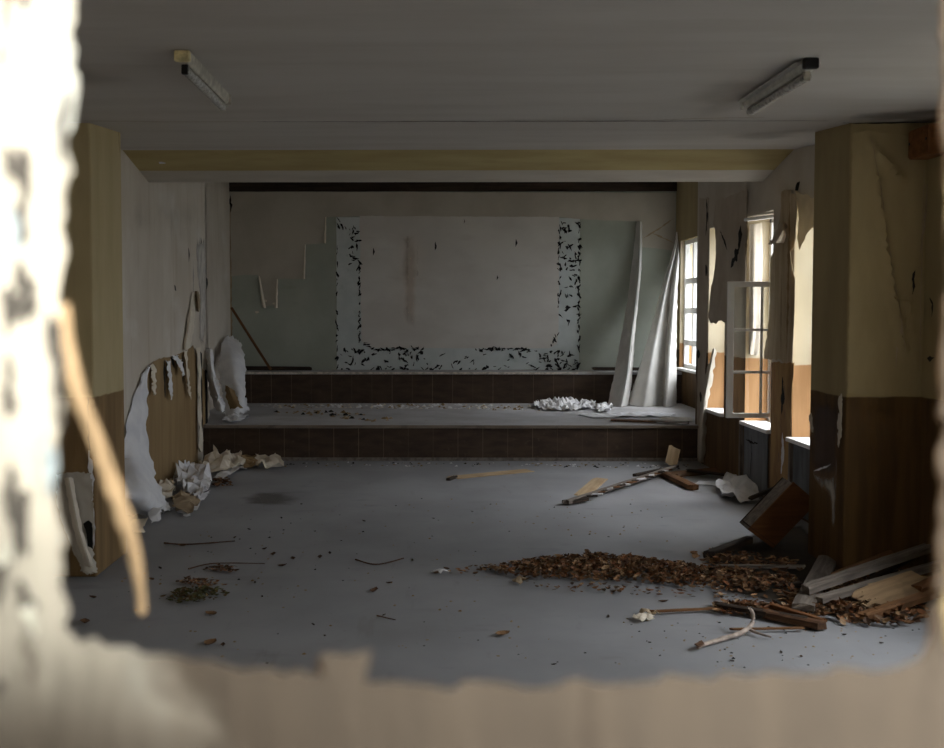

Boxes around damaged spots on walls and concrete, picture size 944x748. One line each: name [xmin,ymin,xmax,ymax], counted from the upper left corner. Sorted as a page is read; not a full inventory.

peeling [54,85,70,162]
peeling [0,458,39,636]
peeling [0,142,66,433]
peeling [39,436,98,575]
peeling [124,291,250,516]
peeling [697,197,709,463]
peeling [764,189,814,488]